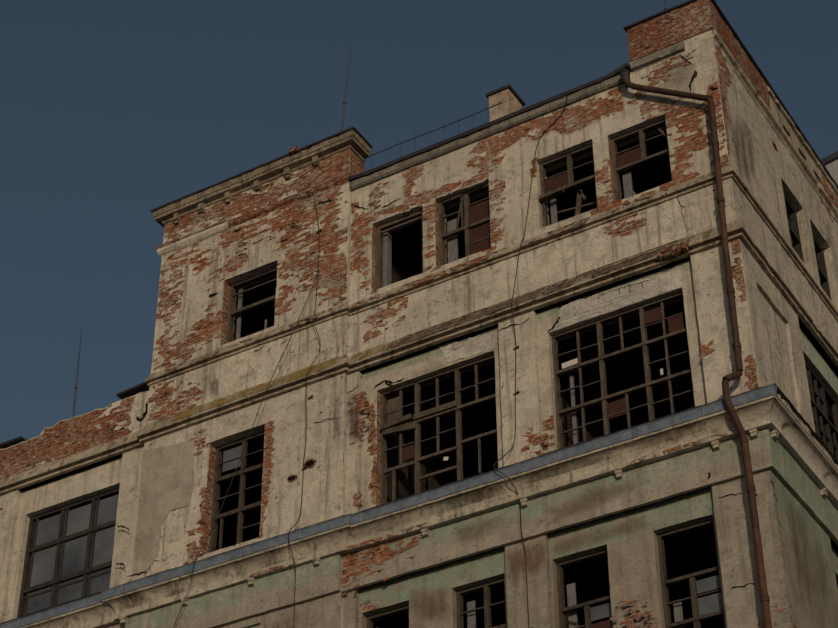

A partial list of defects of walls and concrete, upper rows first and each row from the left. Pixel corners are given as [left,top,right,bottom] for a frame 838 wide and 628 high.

crack [681,55,718,91]
peeling [146,45,733,425]
spalling [730,238,747,302]
spalling [0,395,136,480]
peeling [188,429,210,456]
spalling [258,420,275,539]
spalling [347,391,377,507]
peeling [521,415,555,456]
spalling [184,486,207,565]
peeling [341,521,431,596]
spalling [358,600,379,621]